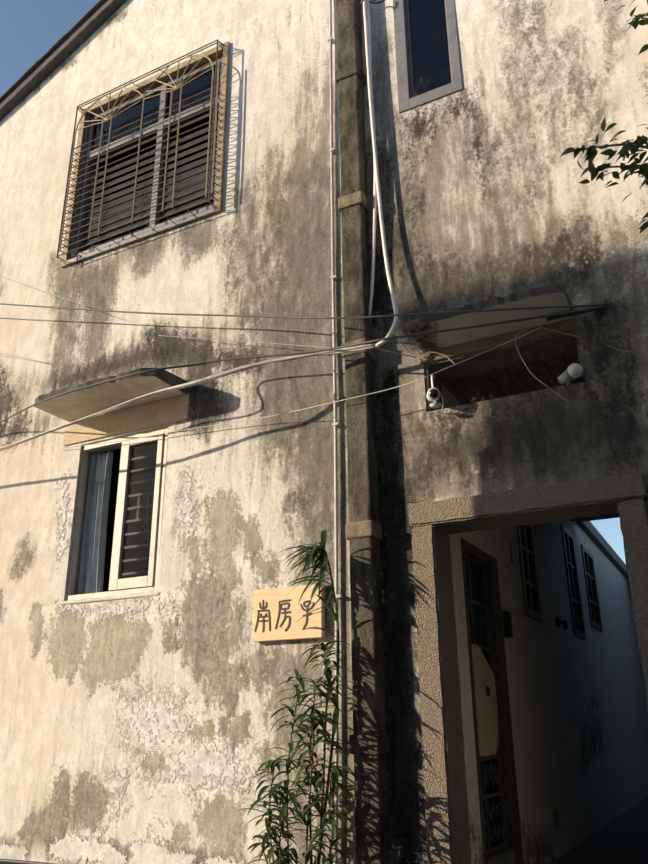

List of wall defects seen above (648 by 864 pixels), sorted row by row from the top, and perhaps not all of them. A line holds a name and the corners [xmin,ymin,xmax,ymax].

leakage [366,91,603,355]
leakage [500,0,558,205]
leakage [544,67,596,162]
leakage [0,368,32,446]
leakage [49,154,346,600]
peeling [0,467,317,864]
leakage [375,300,646,864]